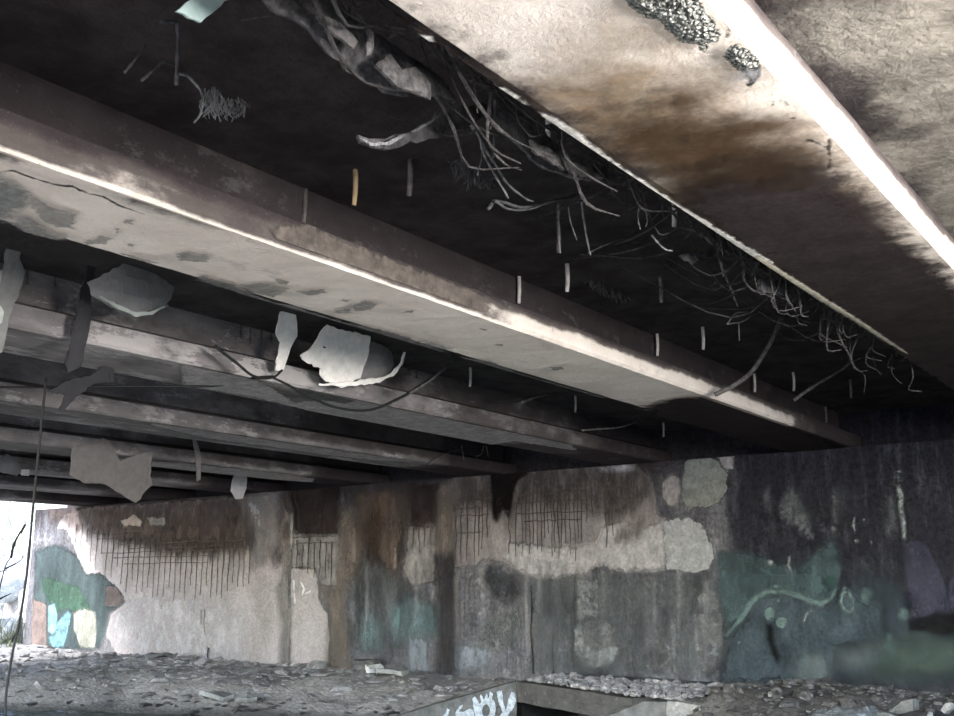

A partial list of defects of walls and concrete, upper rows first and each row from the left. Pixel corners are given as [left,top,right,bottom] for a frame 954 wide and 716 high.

spalling [625,0,722,53]
spalling [723,43,761,87]
peeling [0,249,25,353]
spalling [0,179,77,240]
crack [5,170,143,214]
spalling [85,220,132,245]
peeling [87,244,175,317]
spalling [178,252,208,262]
peeling [182,276,577,450]
spalling [452,456,733,579]
water stain [435,553,460,675]